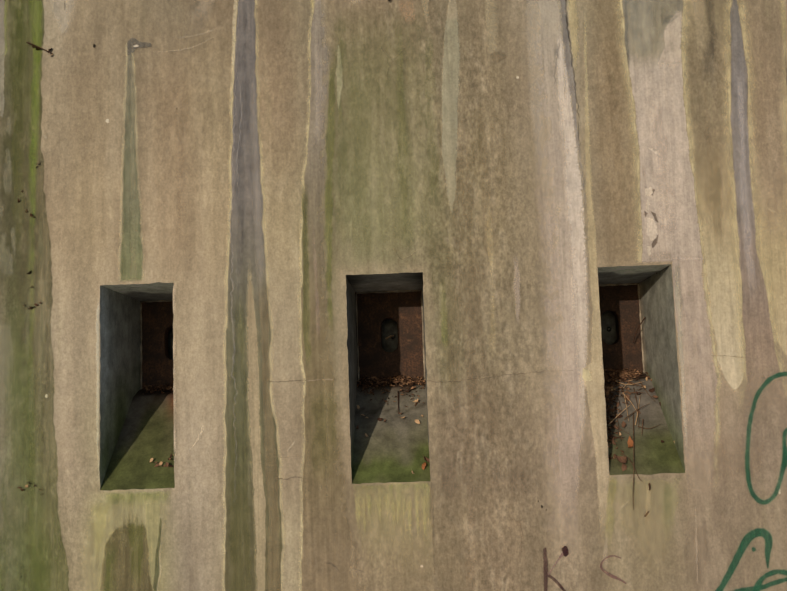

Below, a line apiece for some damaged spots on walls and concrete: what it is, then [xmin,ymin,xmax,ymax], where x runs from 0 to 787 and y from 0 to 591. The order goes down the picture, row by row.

leakage [120,38,151,280]
leakage [223,0,284,591]
leakage [729,0,780,378]
leakage [100,504,162,591]